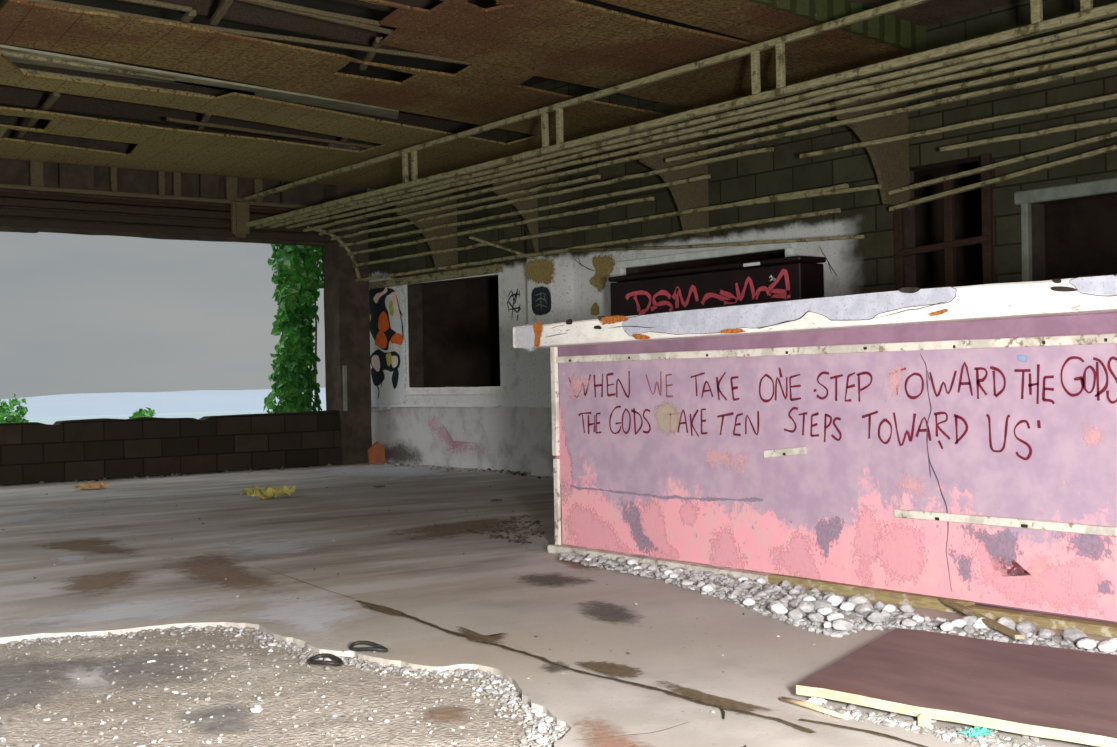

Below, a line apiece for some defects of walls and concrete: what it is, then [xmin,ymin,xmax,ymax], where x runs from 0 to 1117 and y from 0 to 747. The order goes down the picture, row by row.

peeling [589,255,615,329]
peeling [622,286,957,336]
peeling [1050,274,1117,297]
crack [920,354,952,591]
peeling [768,531,820,580]
peeling [965,537,1104,615]
spalling [0,625,570,747]
crack [263,567,928,747]